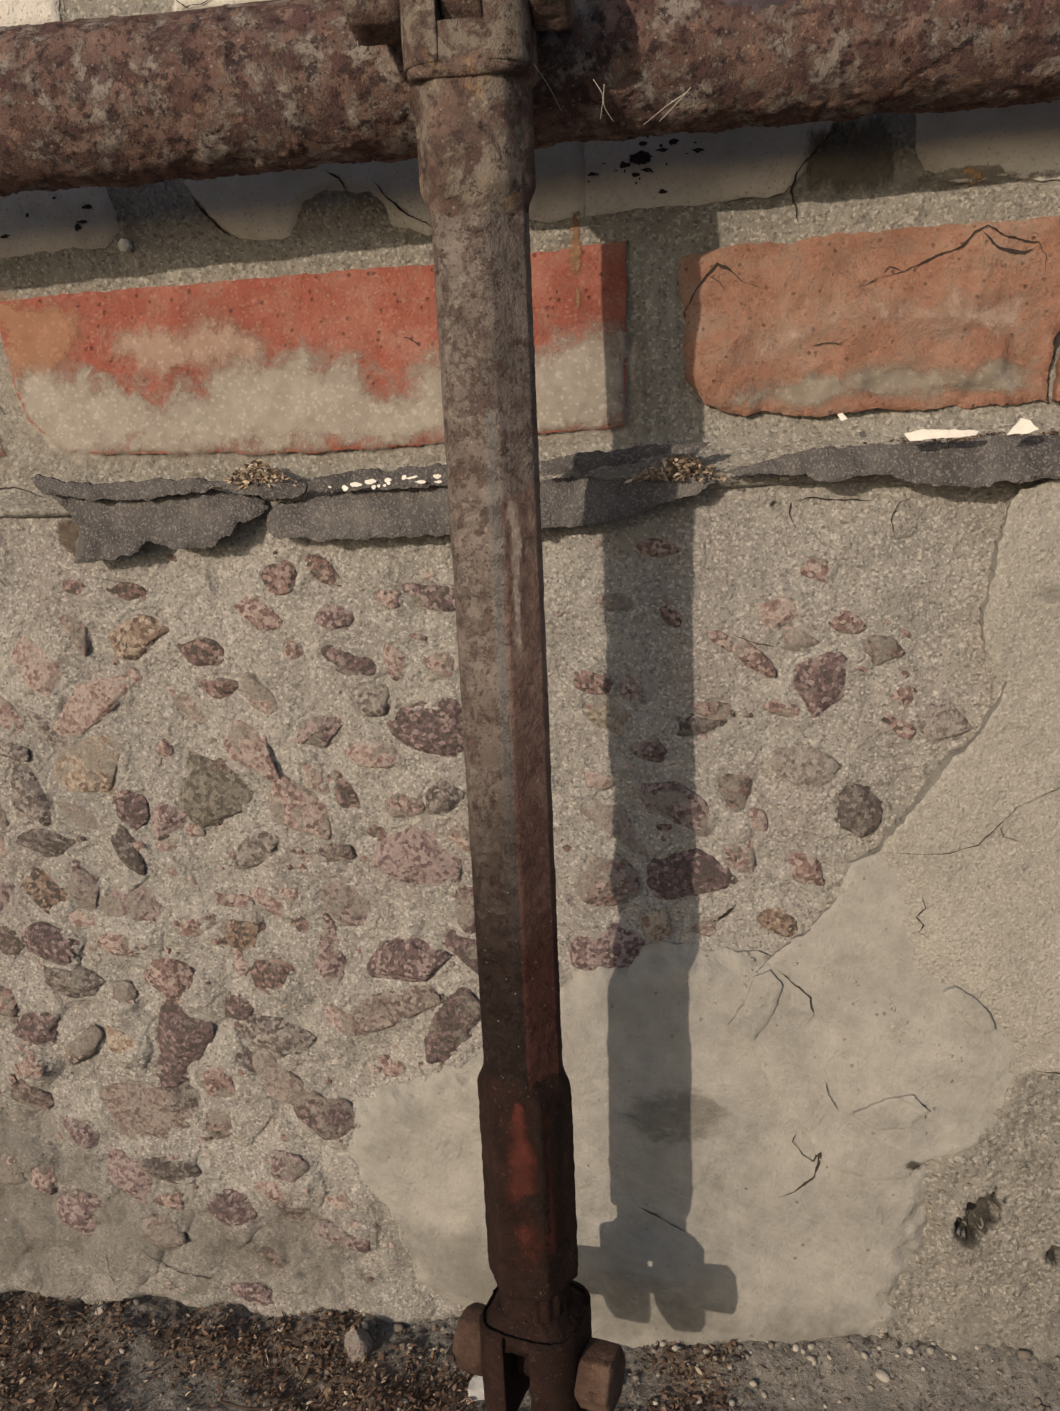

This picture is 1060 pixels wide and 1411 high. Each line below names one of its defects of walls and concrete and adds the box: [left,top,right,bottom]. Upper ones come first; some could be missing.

crack [790,122,848,225]
crack [850,225,1047,292]
crack [1046,331,1060,401]
crack [877,788,1059,855]
spalling [0,514,493,1321]
spalling [541,479,1060,1360]
crack [779,971,814,1026]
crack [782,1131,822,1197]